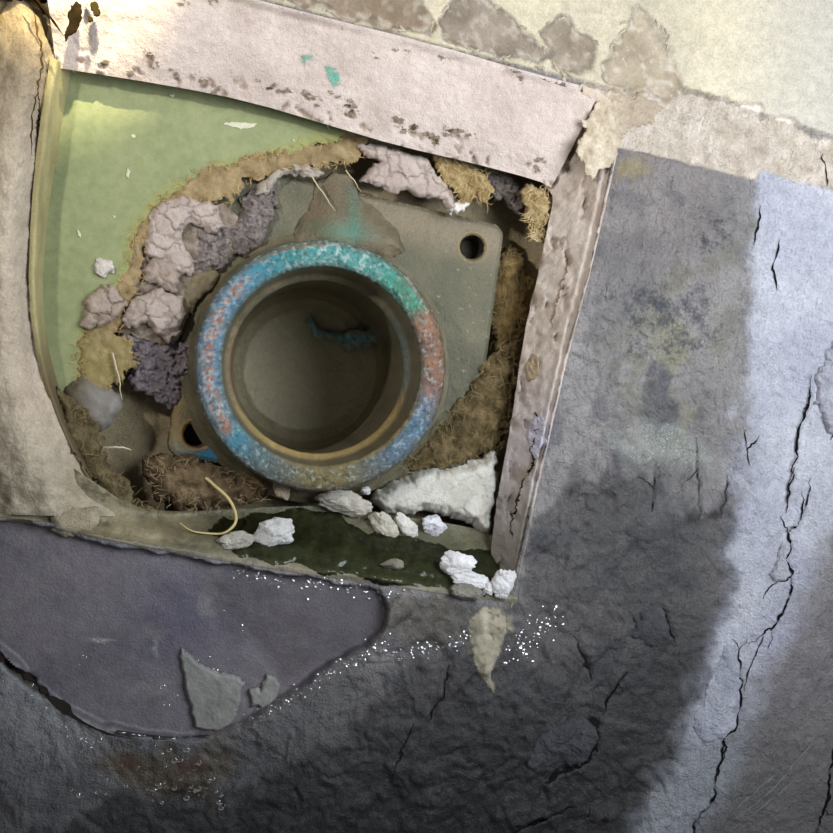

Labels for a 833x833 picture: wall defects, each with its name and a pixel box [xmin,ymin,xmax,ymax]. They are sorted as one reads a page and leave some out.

spalling [279,0,681,101]
spalling [284,154,553,382]
crack [771,239,780,288]
spalling [99,369,176,511]
spalling [361,490,472,528]
spalling [494,431,510,492]
crack [510,412,540,539]
crack [686,437,701,520]
spalling [0,521,386,739]
crack [693,376,812,833]
crack [544,672,628,783]
crack [816,751,833,833]